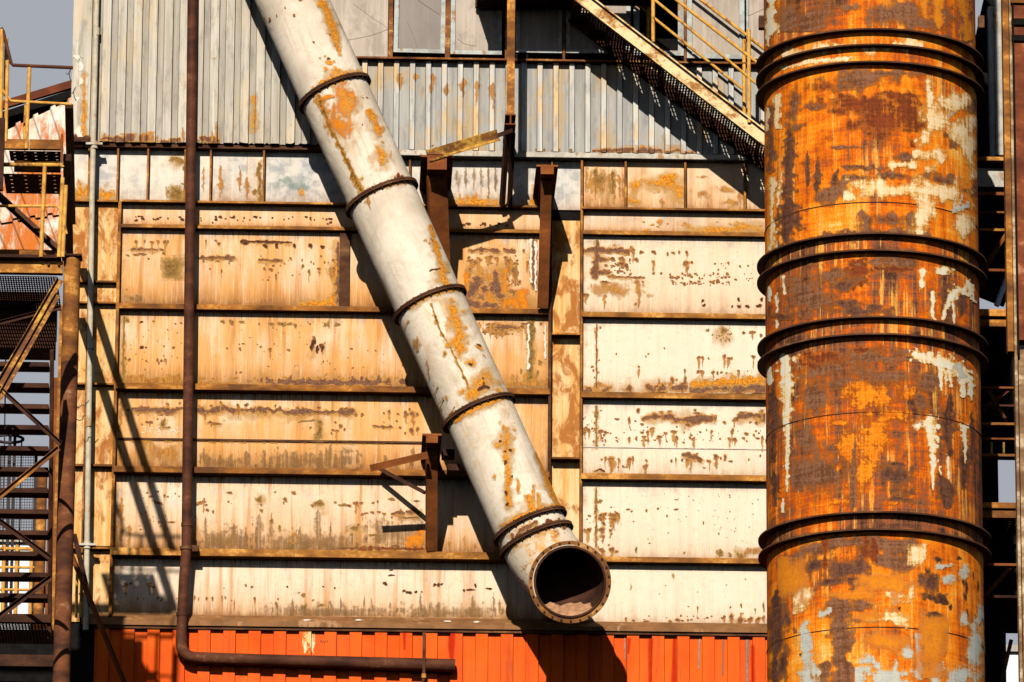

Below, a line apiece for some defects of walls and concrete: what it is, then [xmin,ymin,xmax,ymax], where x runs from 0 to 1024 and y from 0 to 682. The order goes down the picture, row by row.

corrosion [312,0,392,165]
corrosion [681,69,978,255]
corrosion [240,239,339,306]
corrosion [388,224,548,423]
corrosion [583,239,754,308]
corrosion [731,257,917,320]
peeling [954,212,975,239]
corrosion [117,401,394,466]
corrosion [310,497,425,551]
corrosion [492,422,566,546]
corrosion [582,323,977,510]
corrosion [666,534,952,682]